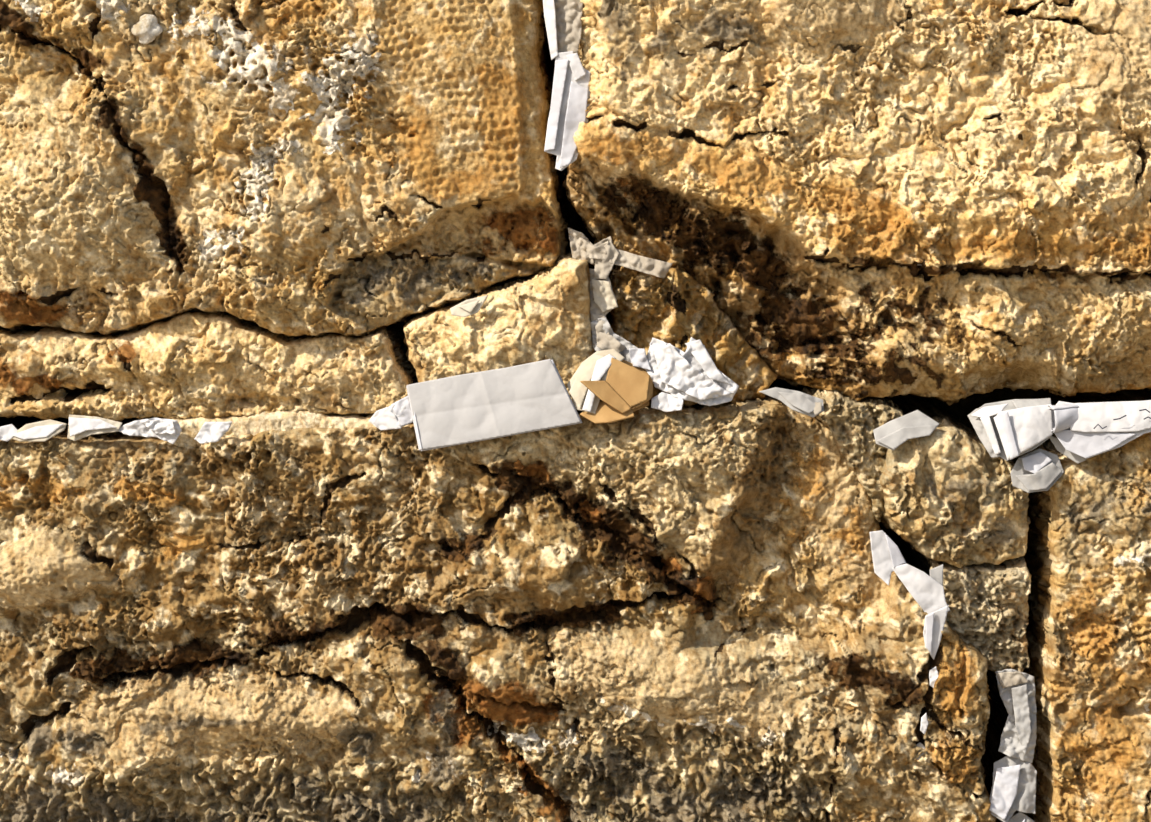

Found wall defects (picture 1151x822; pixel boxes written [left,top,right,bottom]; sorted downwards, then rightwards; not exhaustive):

crack [0,15,107,97]
crack [678,40,749,57]
crack [841,44,862,53]
crack [898,0,912,31]
crack [1005,0,1109,33]
crack [587,116,789,146]
crack [477,464,600,541]
crack [445,483,717,741]
crack [18,646,89,752]
crack [105,663,190,688]
crack [256,602,386,708]
crack [404,639,581,822]